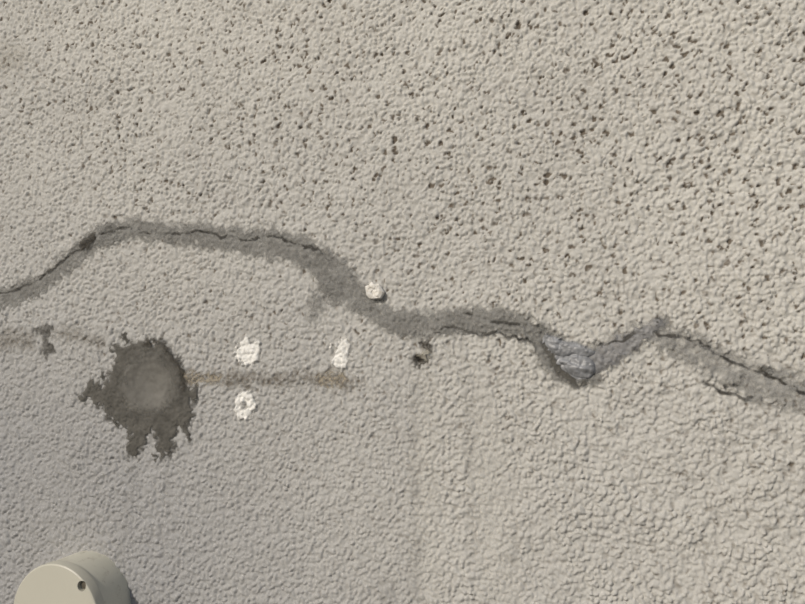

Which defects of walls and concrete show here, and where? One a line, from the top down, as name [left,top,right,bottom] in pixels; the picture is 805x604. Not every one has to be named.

crack [0,216,564,346]
crack [592,316,805,410]